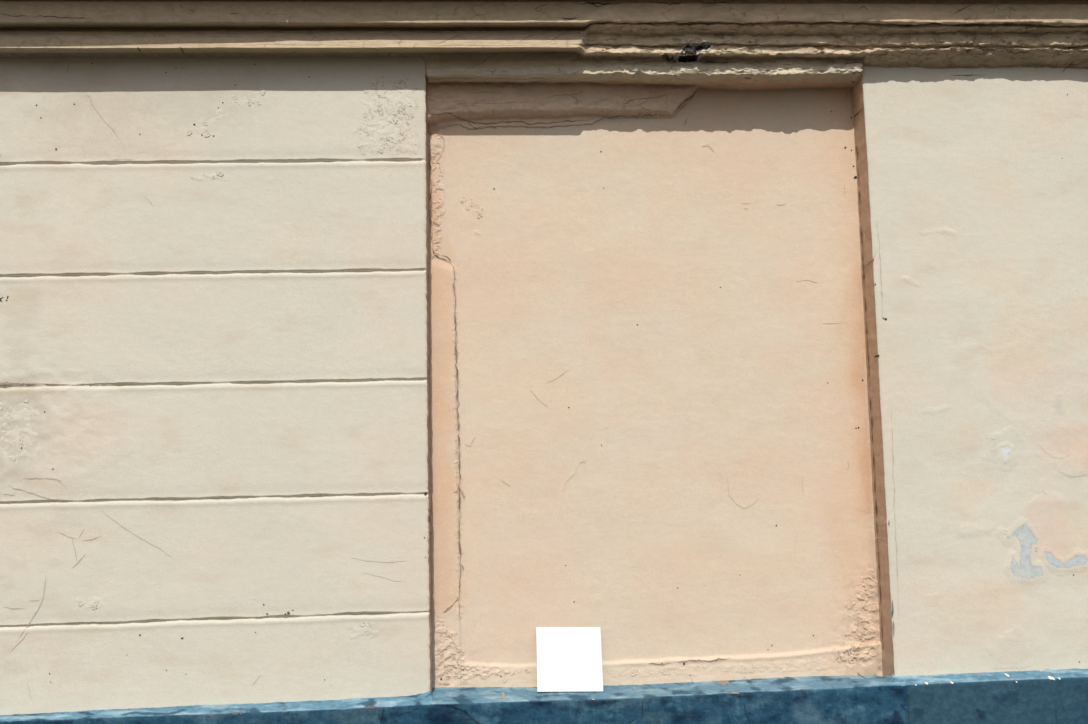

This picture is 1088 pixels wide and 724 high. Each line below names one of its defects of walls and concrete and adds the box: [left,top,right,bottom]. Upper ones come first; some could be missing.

crack [657,51,727,63]
spalling [674,40,715,65]
crack [427,88,699,622]
peeling [994,515,1088,586]